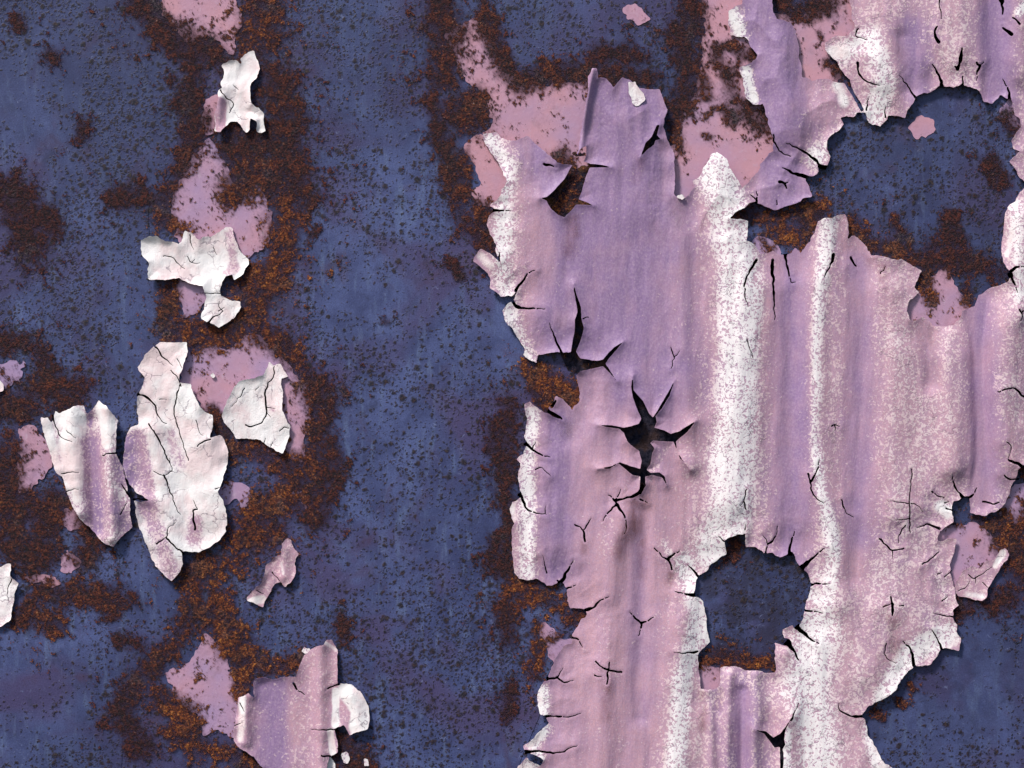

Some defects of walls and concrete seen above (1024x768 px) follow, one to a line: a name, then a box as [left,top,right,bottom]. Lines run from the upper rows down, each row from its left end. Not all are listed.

corrosion [388,0,773,296]
peeling [711,0,1024,346]
peeling [0,0,290,768]
corrosion [0,0,375,768]
corrosion [330,726,401,768]
peeling [233,0,597,768]
corrosion [456,339,586,730]
crack [512,270,698,612]
crack [718,489,829,661]
crack [757,703,799,768]
peeling [847,447,1024,768]
crack [879,442,1022,650]